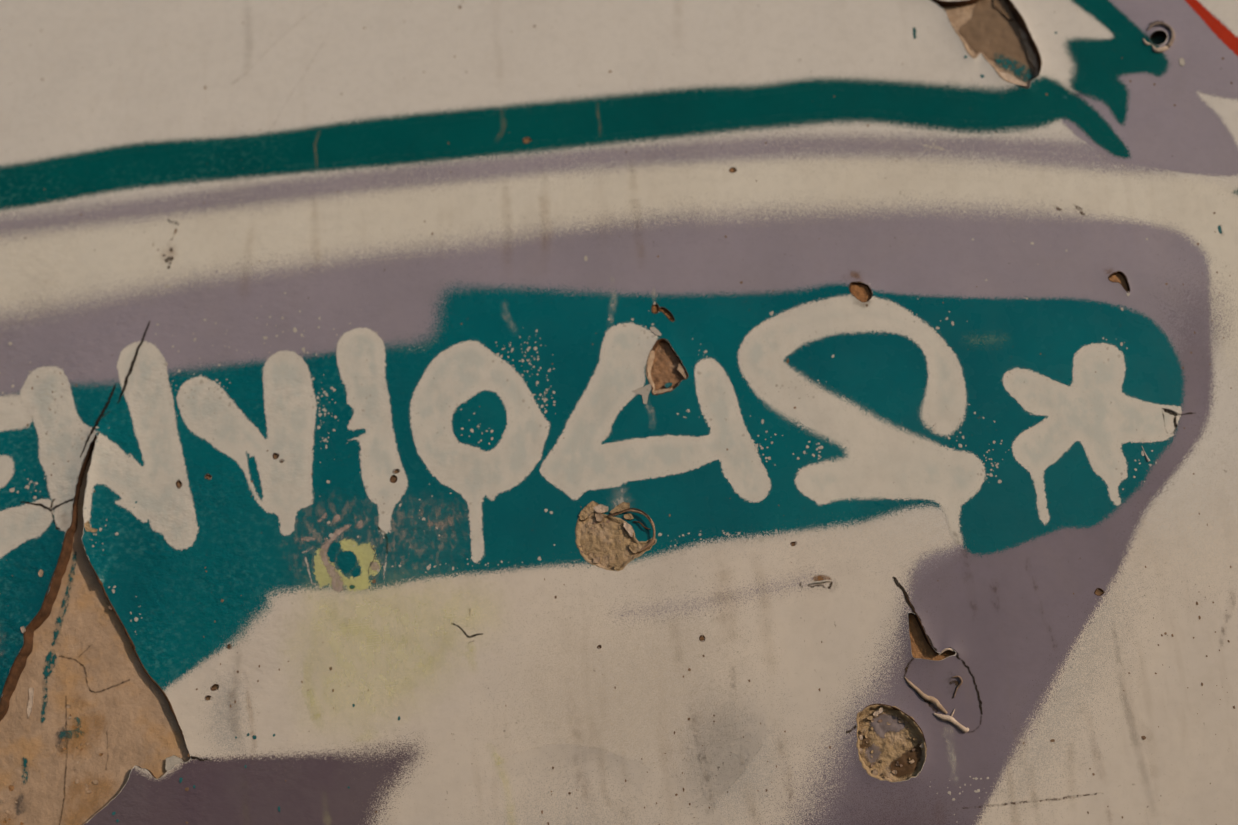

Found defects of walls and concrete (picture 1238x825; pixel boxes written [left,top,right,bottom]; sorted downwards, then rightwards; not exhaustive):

peeling [931,0,1042,88]
peeling [849,274,873,303]
peeling [1108,271,1130,296]
flaking render [632,302,688,404]
crack [20,321,150,530]
flaking render [575,498,657,571]
peeling [0,446,191,825]
peeling [893,577,983,733]
flaking render [846,704,927,782]